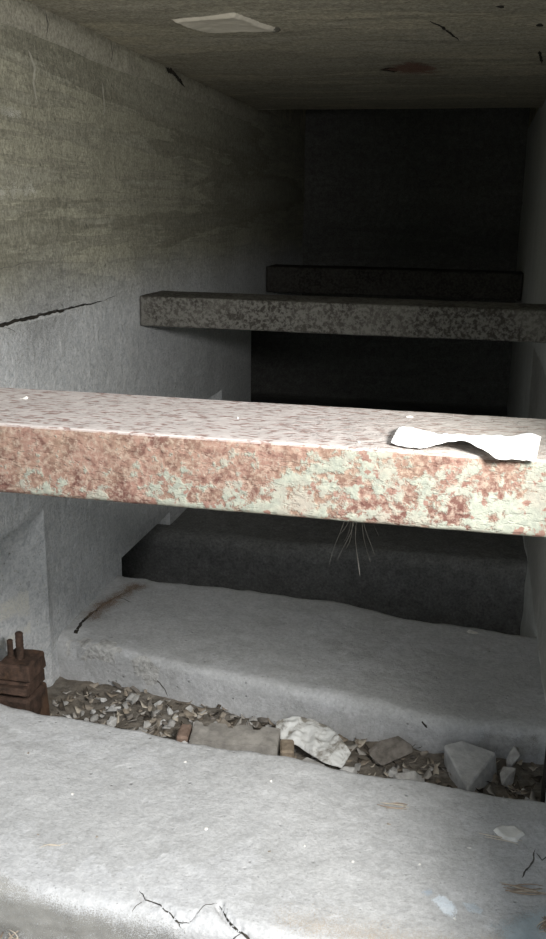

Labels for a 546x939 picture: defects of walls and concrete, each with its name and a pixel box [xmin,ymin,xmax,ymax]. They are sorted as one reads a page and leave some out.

crack [0,296,114,333]
crack [74,582,151,634]
crack [132,891,250,939]